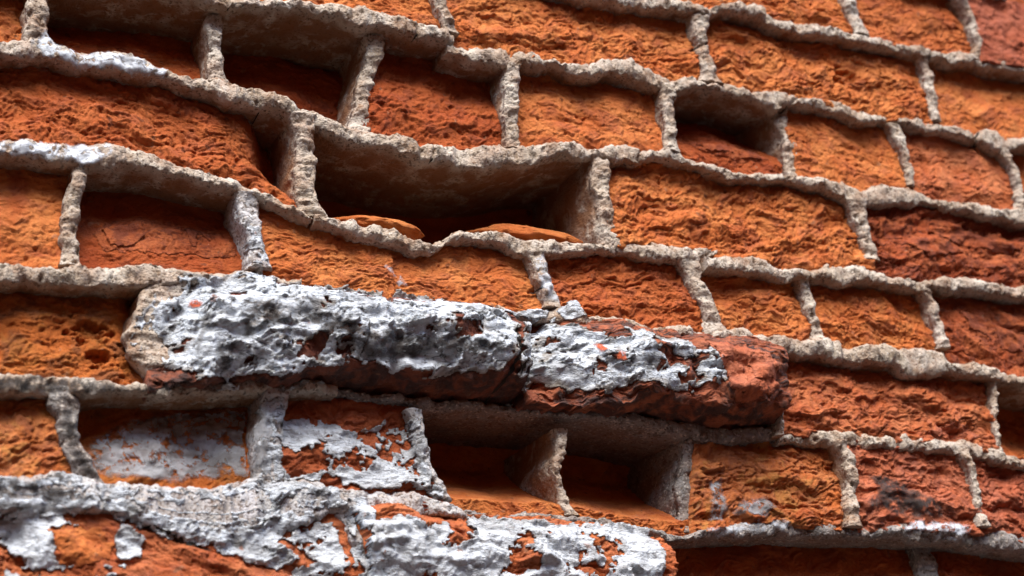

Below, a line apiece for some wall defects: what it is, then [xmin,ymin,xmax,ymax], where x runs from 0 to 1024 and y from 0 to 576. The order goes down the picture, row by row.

spalling [683,142,769,164]
peeling [0,210,780,576]